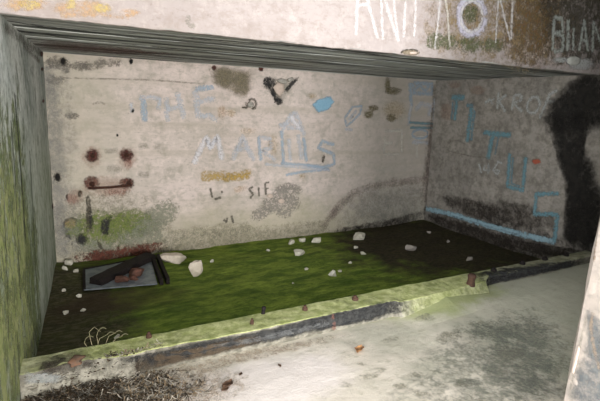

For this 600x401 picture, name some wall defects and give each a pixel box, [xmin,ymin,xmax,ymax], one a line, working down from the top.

leakage [212,65,248,94]
leakage [426,0,600,257]
leakage [11,93,26,239]
corrosion [85,149,98,162]
corrosion [120,149,133,162]
leakage [78,191,112,244]
corrosion [75,242,163,262]